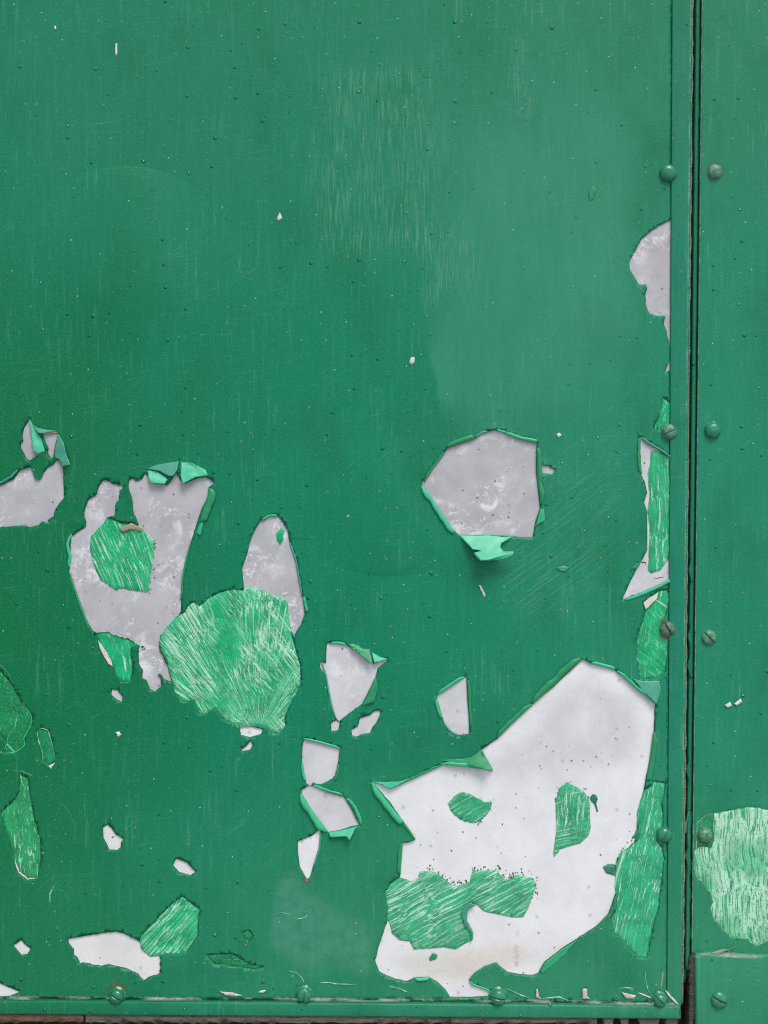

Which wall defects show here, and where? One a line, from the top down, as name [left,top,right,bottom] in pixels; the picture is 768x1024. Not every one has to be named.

peeling [629,220,671,344]
peeling [0,419,71,527]
peeling [66,461,216,691]
peeling [242,514,308,635]
peeling [421,429,555,561]
peeling [623,436,670,610]
peeling [298,642,387,879]
peeling [371,657,660,997]
peeling [68,932,161,980]